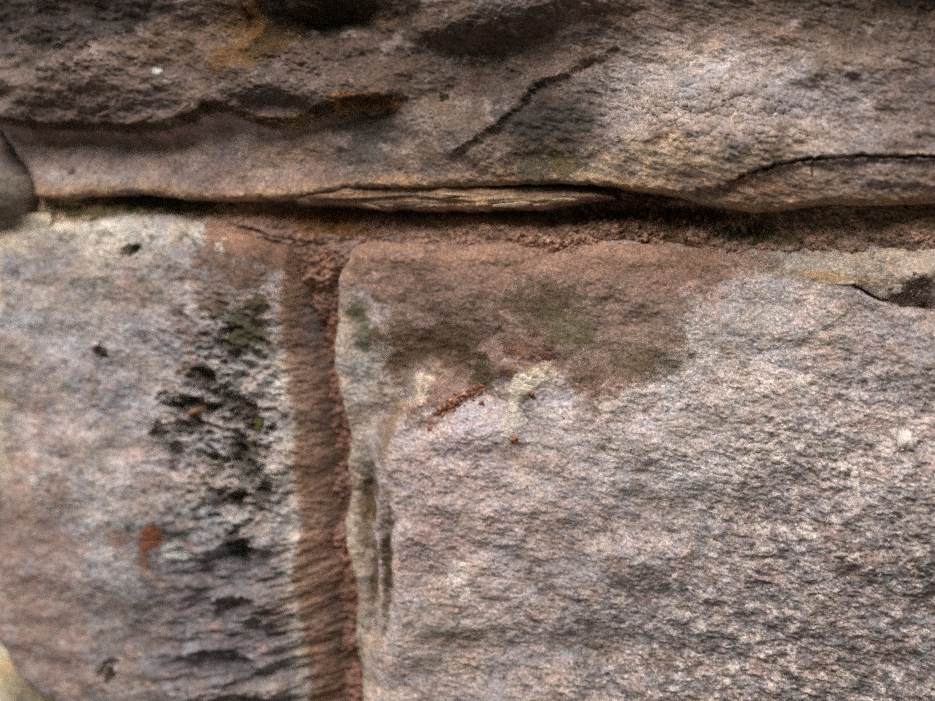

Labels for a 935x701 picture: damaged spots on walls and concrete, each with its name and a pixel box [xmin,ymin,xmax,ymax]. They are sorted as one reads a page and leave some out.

crack [849,152,935,160]
crack [728,157,827,183]
damp [165,542,192,560]